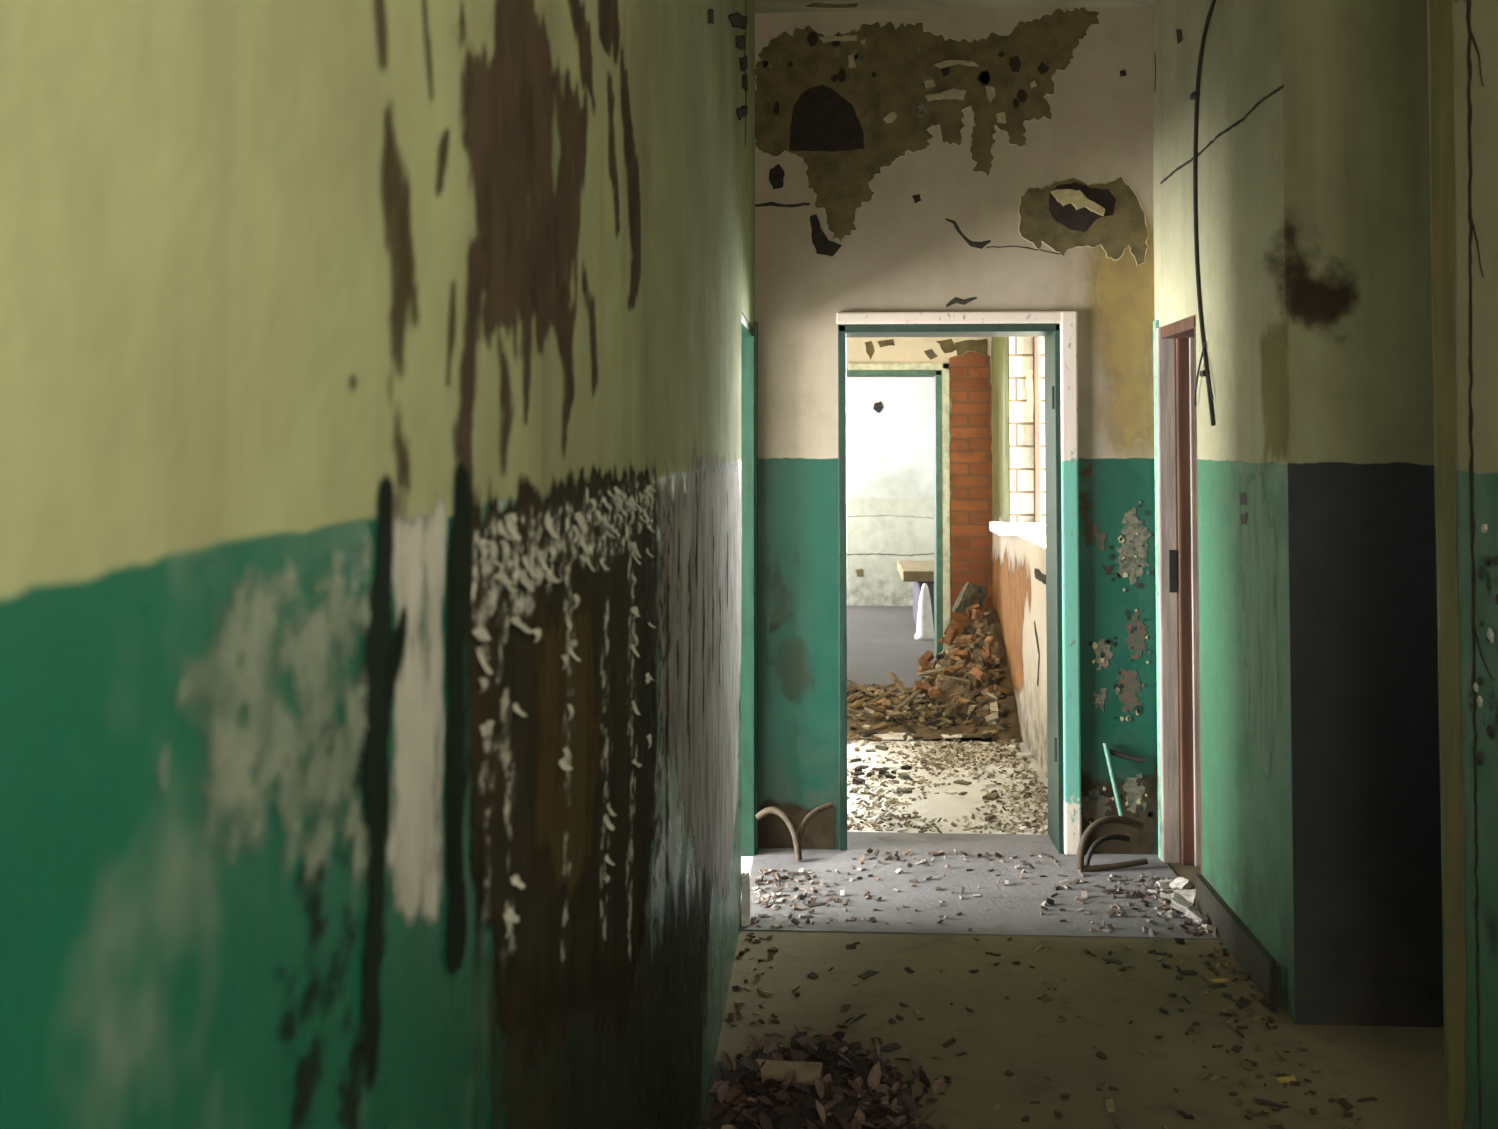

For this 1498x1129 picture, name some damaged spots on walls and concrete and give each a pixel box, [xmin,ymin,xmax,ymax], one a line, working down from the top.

leakage [376,0,388,69]
leakage [424,0,433,99]
peeling [707,0,1101,257]
leakage [382,105,420,388]
spalling [1018,176,1149,266]
leakage [437,0,641,977]
peeling [1079,465,1153,592]
peeling [1088,609,1151,721]
peeling [466,450,742,1129]
peeling [1081,773,1152,824]